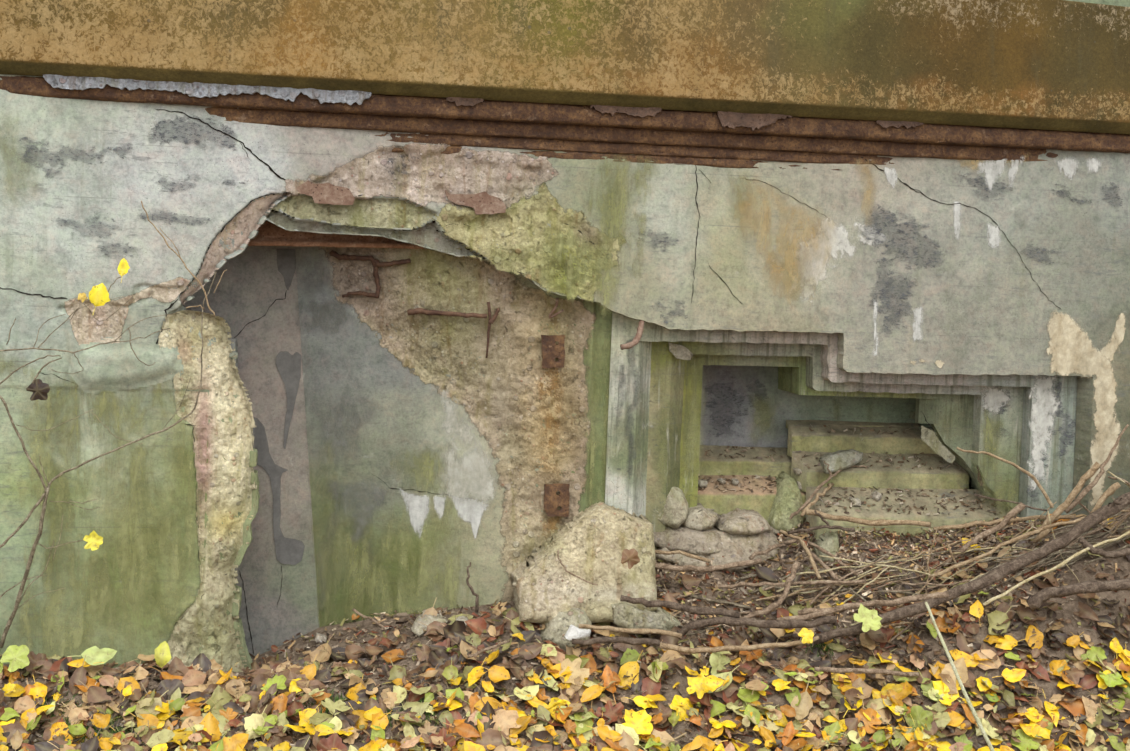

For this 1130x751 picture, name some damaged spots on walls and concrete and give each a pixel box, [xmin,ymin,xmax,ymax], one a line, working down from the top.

spalling [43,74,371,106]
crack [156,109,295,344]
corrosion [590,105,662,118]
crack [691,165,741,303]
corrosion [717,111,792,131]
water stain [771,207,945,356]
crack [861,157,1061,309]
water stain [963,159,1022,200]
water stain [1053,159,1123,206]
spalling [64,143,626,672]
water stain [402,390,494,538]
peeling [1047,312,1125,506]